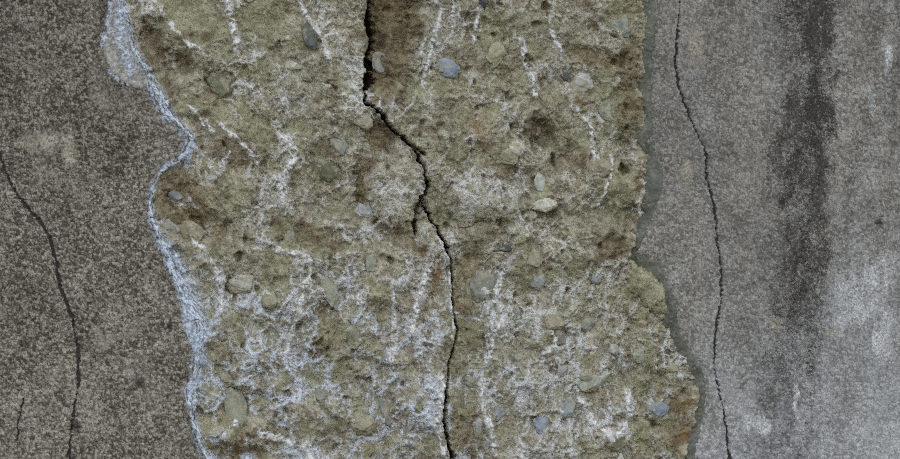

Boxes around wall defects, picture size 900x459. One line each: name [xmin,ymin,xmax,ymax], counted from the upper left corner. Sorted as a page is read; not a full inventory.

crack [0,151,81,459]
damp [120,0,214,459]
damp [188,105,259,175]
damp [270,118,298,207]
spalling [101,0,705,459]
crack [362,7,449,254]
damp [433,373,447,459]
crack [442,352,453,459]
damp [478,265,508,457]
damp [573,378,632,442]
crack [674,1,732,459]
damp [768,0,897,364]